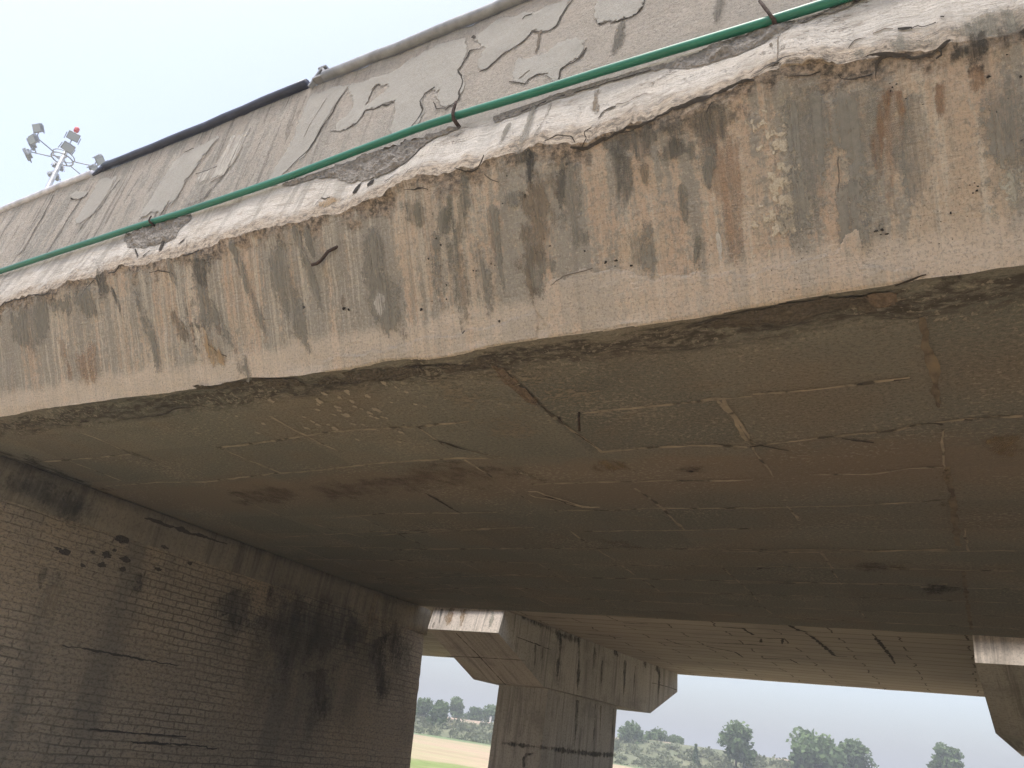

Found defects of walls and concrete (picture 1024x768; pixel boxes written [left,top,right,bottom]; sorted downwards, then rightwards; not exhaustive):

peeling [268,0,860,193]
peeling [123,132,247,257]
crack [455,155,499,183]
leakage [498,105,551,189]
leakage [603,100,740,200]
leakage [404,172,505,330]
peeling [318,104,926,423]
leakage [8,265,120,351]
spalling [193,378,305,390]
crack [62,645,178,666]
crack [666,625,844,664]
crack [90,728,217,750]